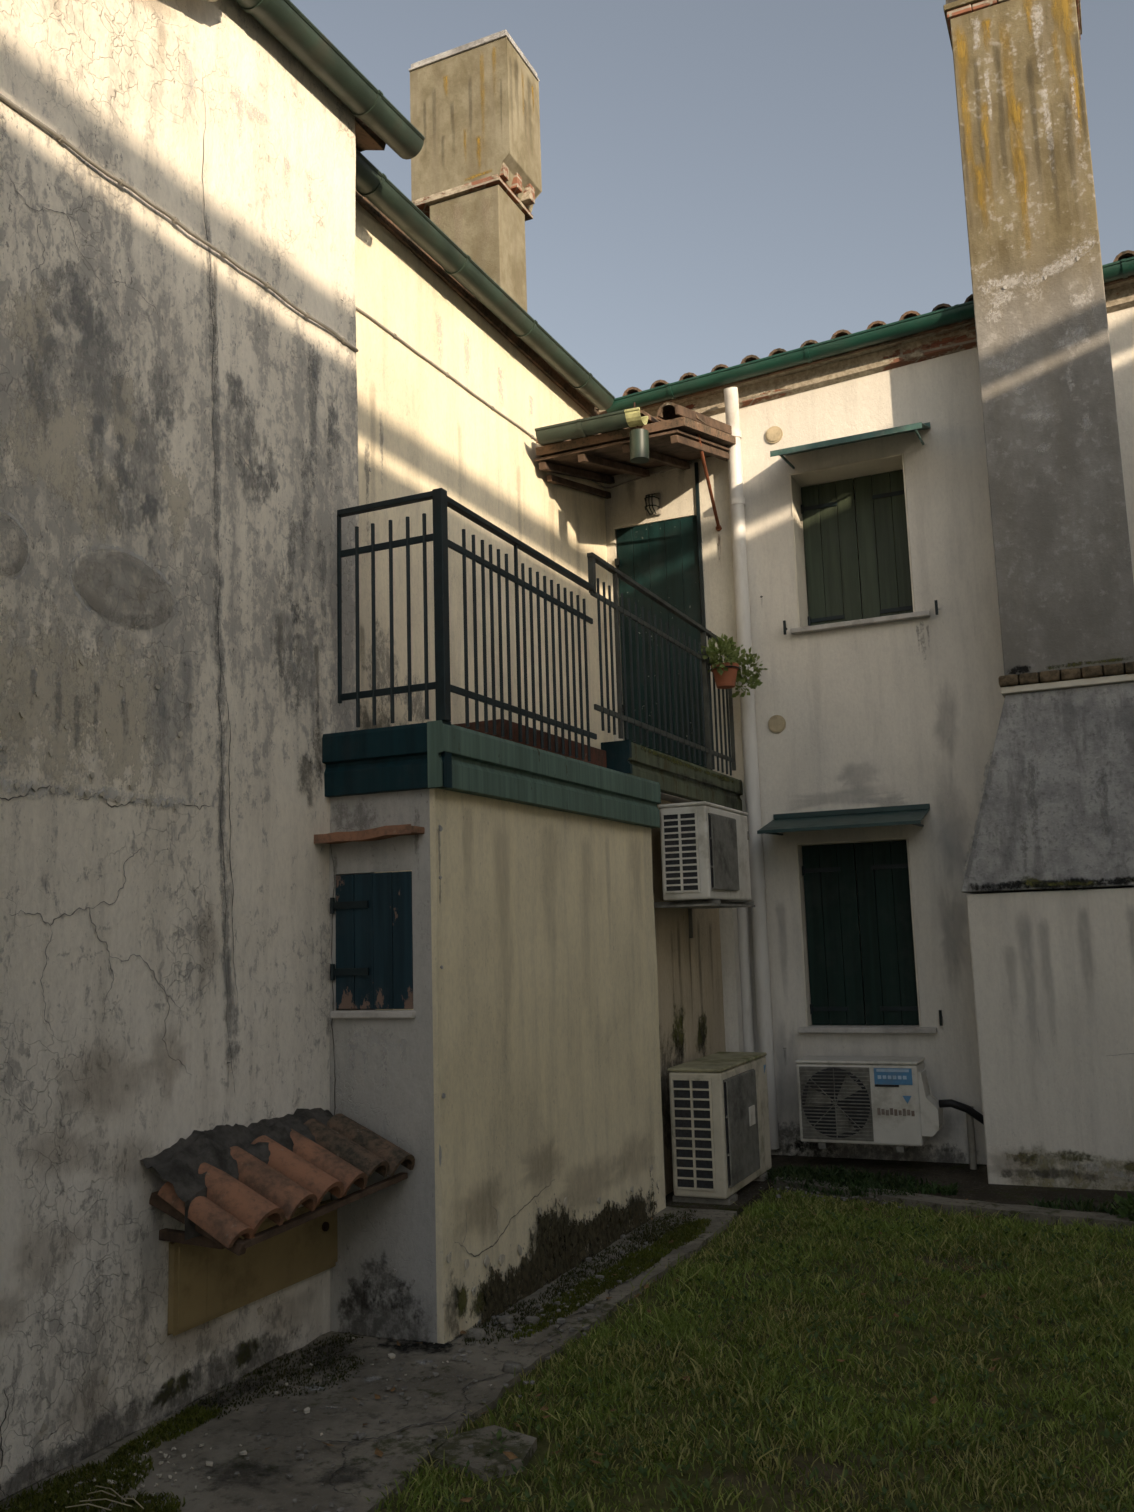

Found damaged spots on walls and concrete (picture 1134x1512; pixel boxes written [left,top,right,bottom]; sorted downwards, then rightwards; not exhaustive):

water stain [1068,50,1080,120]
crack [202,74,238,1091]
crack [9,849,191,1075]
water stain [303,1260,460,1366]